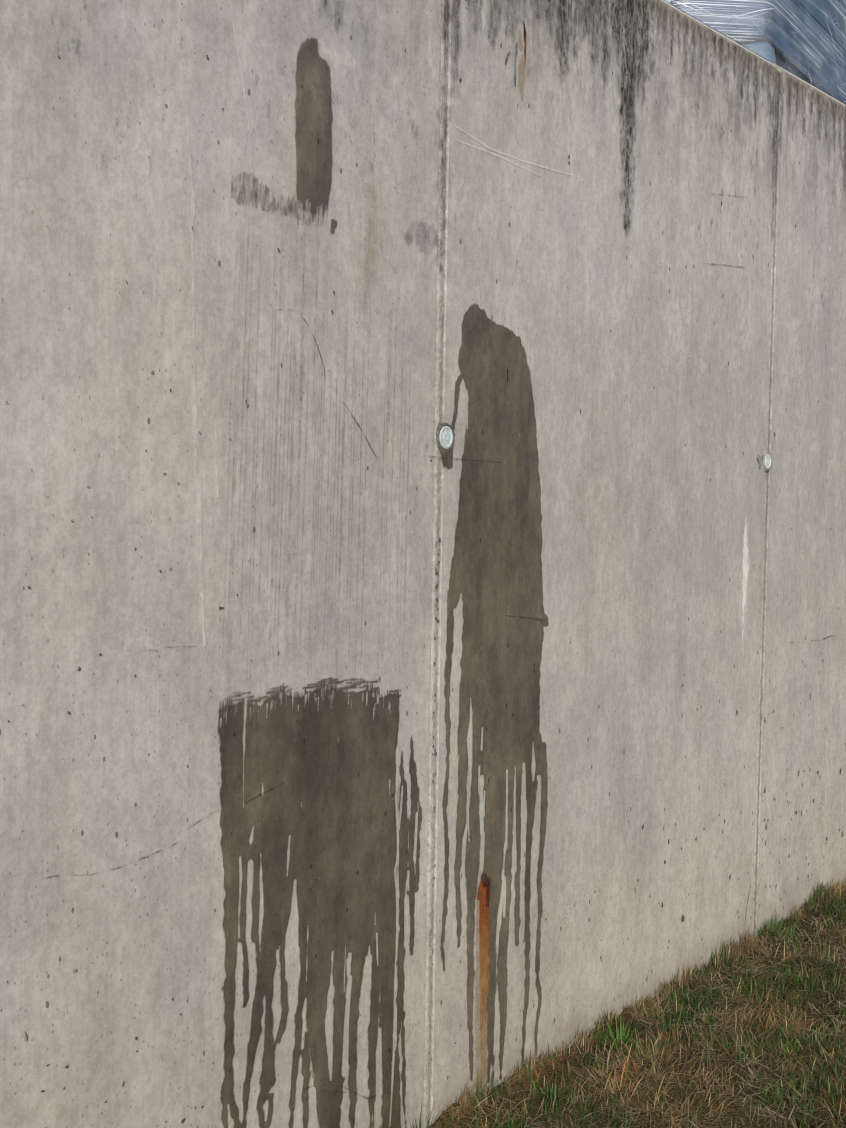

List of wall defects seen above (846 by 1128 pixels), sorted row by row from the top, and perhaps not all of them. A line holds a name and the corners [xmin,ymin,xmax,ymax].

leakage [237,38,349,233]
leakage [537,0,652,232]
leakage [441,304,548,1083]
leakage [218,678,422,1128]
corrosion [476,874,490,1087]